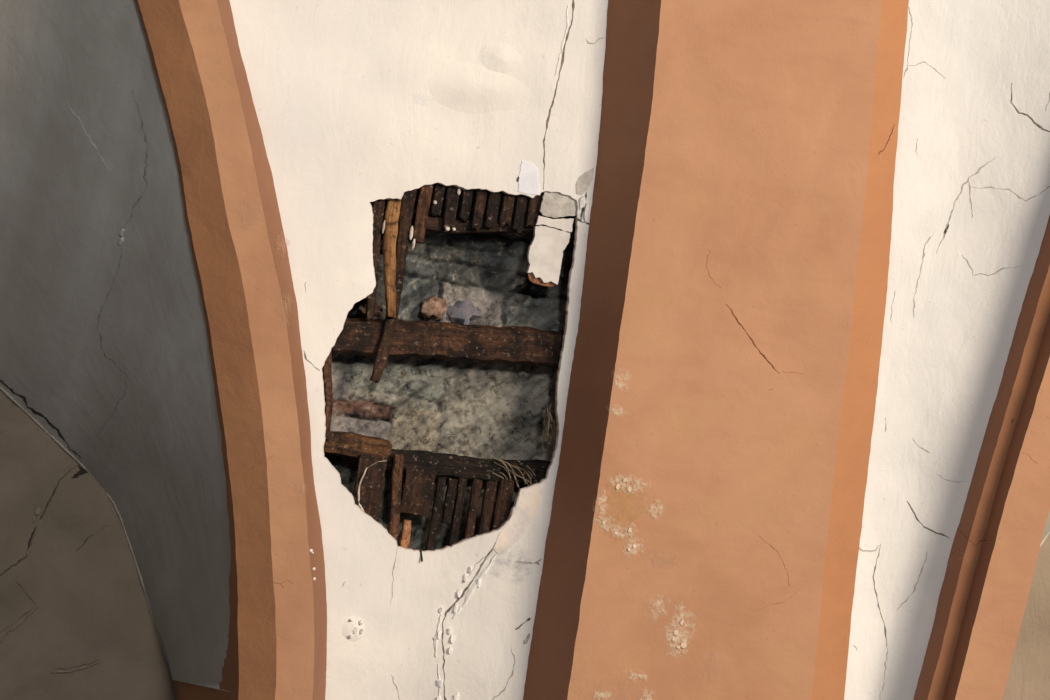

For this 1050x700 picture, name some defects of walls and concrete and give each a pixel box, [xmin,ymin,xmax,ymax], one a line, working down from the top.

crack [543,0,604,190]
crack [903,6,945,78]
crack [1011,83,1050,132]
crack [96,94,149,437]
flaking render [342,168,594,554]
crack [706,252,803,391]
crack [891,157,1050,322]
crack [0,380,81,643]
crack [433,542,542,700]
water stain [596,475,646,554]
water stain [651,600,694,654]
crack [859,501,989,692]